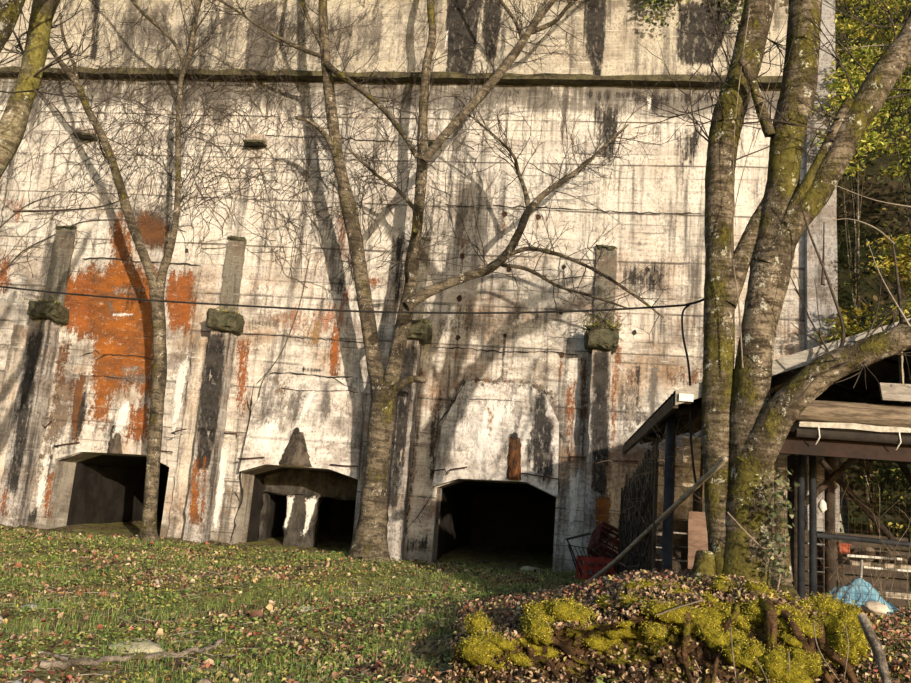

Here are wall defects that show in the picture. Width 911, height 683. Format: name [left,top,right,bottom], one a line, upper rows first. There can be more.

damp [444,0,502,74]
damp [584,0,606,75]
damp [677,0,734,75]
rust [0,257,10,295]
rust [50,210,169,444]
rust [165,269,196,335]
rust [268,287,350,376]
damp [473,392,554,481]
rust [594,493,612,538]